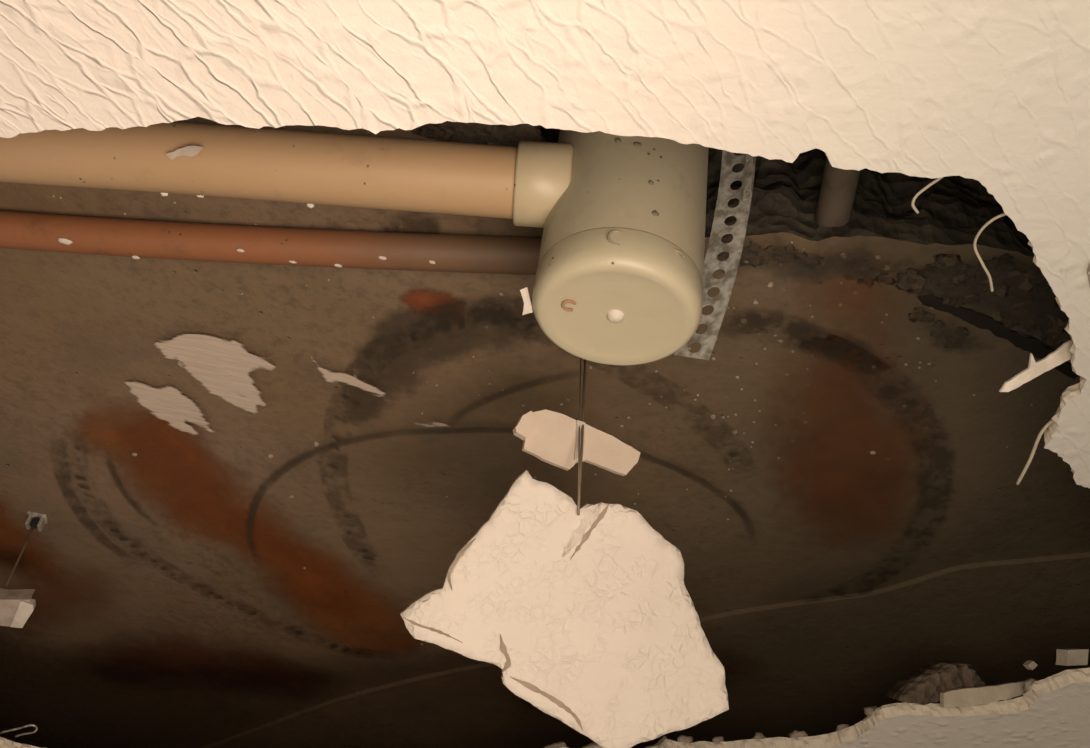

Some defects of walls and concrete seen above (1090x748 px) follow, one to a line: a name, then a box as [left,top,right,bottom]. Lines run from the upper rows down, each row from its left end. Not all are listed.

spalling [411,121,560,147]
rust [402,290,463,322]
spalling [705,147,1086,447]
rust [82,413,420,654]
spalling [0,737,40,748]
spalling [650,668,1090,748]